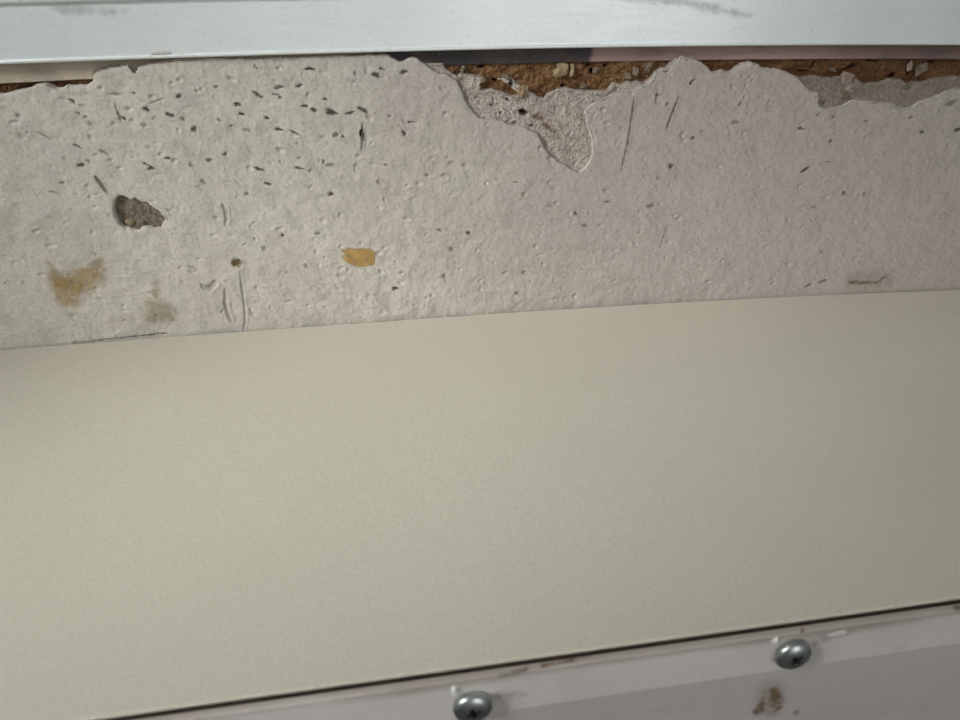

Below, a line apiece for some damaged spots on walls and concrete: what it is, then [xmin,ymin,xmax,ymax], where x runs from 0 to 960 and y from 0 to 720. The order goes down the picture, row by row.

flaking render [425,56,960,173]
flaking render [115,195,165,229]
rust [754,689,781,714]